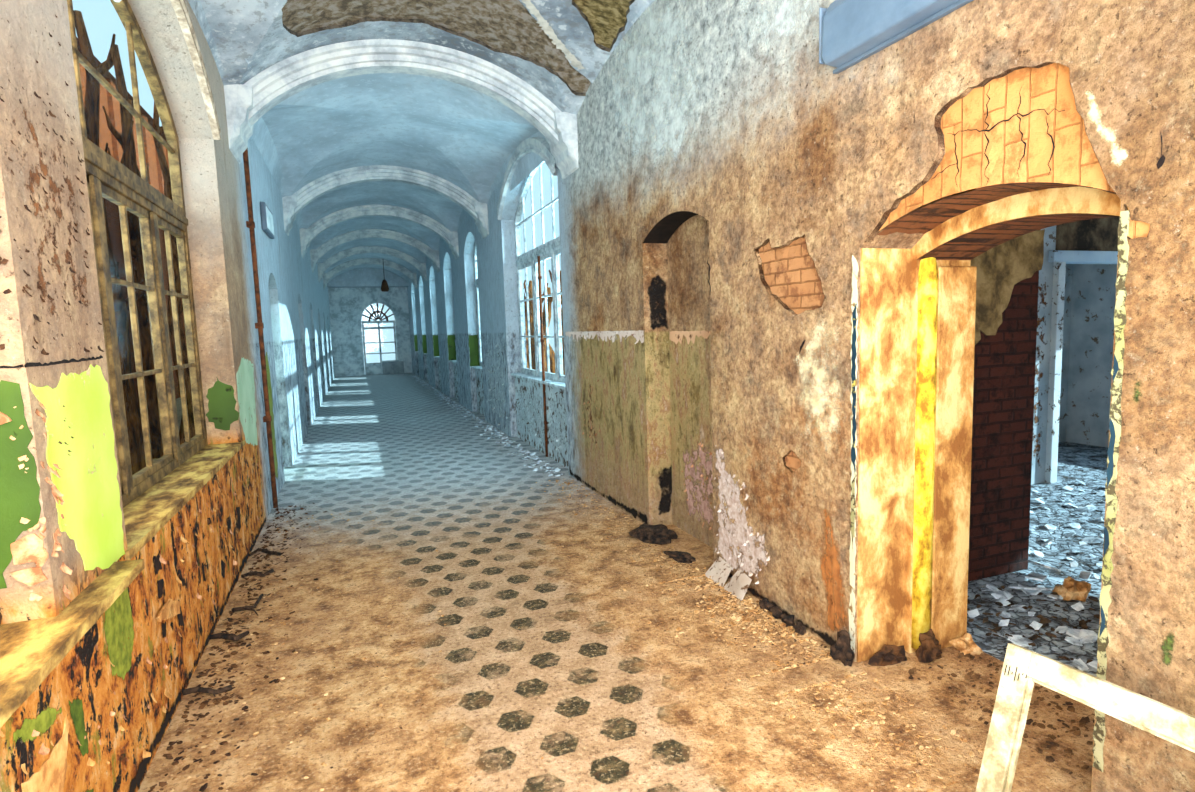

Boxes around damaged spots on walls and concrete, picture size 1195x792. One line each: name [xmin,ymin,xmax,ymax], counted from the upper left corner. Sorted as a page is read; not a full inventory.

spalling [282,0,591,96]
spalling [572,0,635,52]
spalling [755,234,825,315]
spalling [865,62,1150,680]
peeling [10,401,73,602]
peeling [144,445,263,713]
peeling [681,442,771,584]
peeling [848,255,859,653]
flaking render [12,711,127,792]
peeling [1092,709,1106,772]